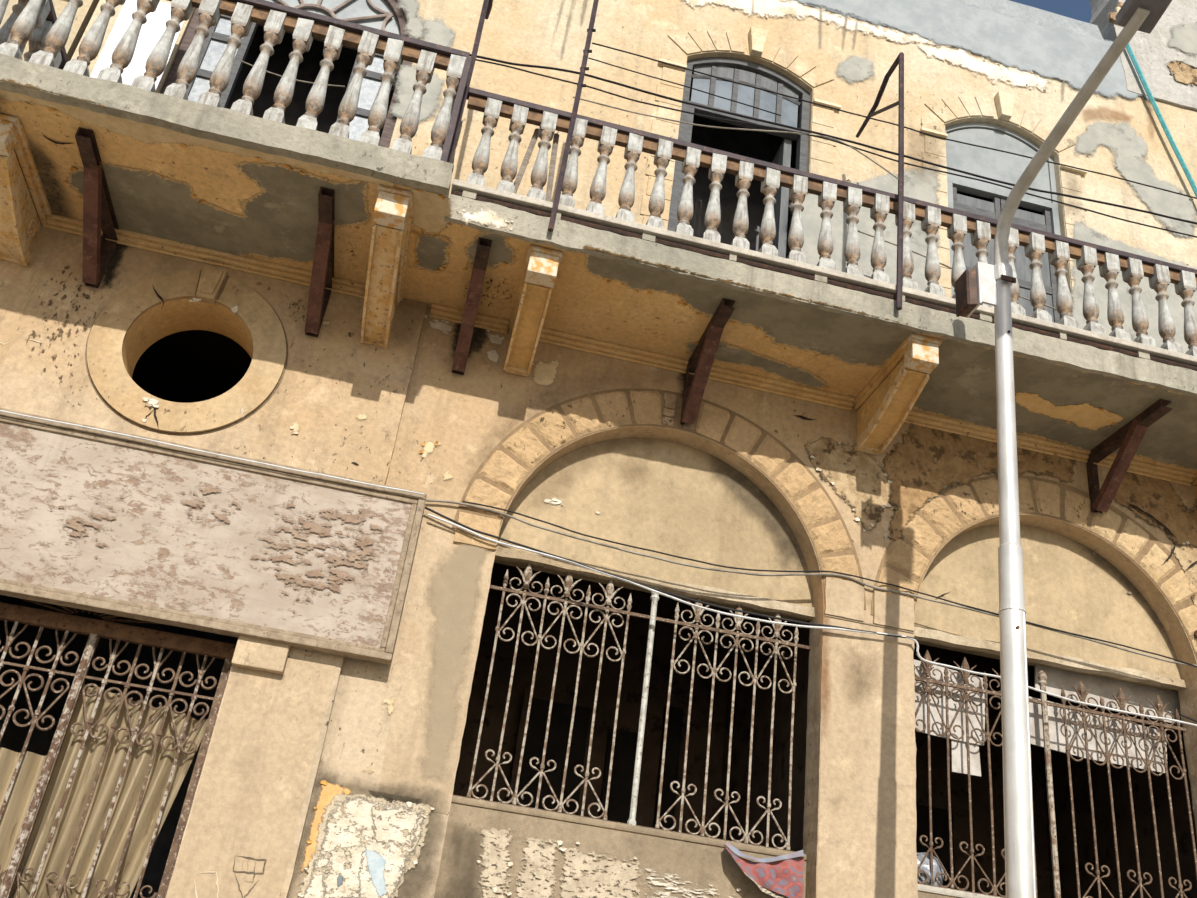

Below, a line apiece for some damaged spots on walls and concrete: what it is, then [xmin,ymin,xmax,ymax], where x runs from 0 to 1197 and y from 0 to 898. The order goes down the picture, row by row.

peeling [686,0,1052,92]
flaking render [1165,60,1197,85]
peeling [0,79,519,307]
rust [455,191,994,324]
rust [1012,323,1197,371]
flaking render [805,338,998,543]
peeling [1013,355,1197,607]
crack [1128,503,1197,570]
peeling [302,780,351,871]